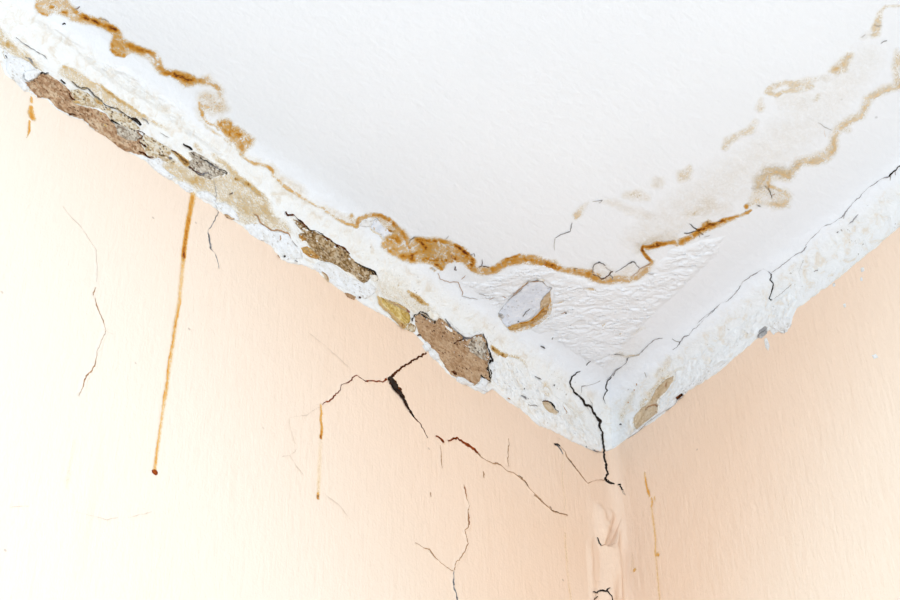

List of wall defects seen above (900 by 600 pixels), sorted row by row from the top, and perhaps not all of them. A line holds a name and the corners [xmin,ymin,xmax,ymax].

crack [61,206,112,397]
corrosion [152,192,195,475]
damp [35,0,328,212]
damp [165,151,288,230]
spalling [3,13,599,447]
crack [432,254,539,300]
damp [338,199,759,290]
peeling [461,236,726,368]
peeling [619,292,797,439]
crack [553,166,900,495]
damp [757,85,900,207]
crack [282,332,568,600]